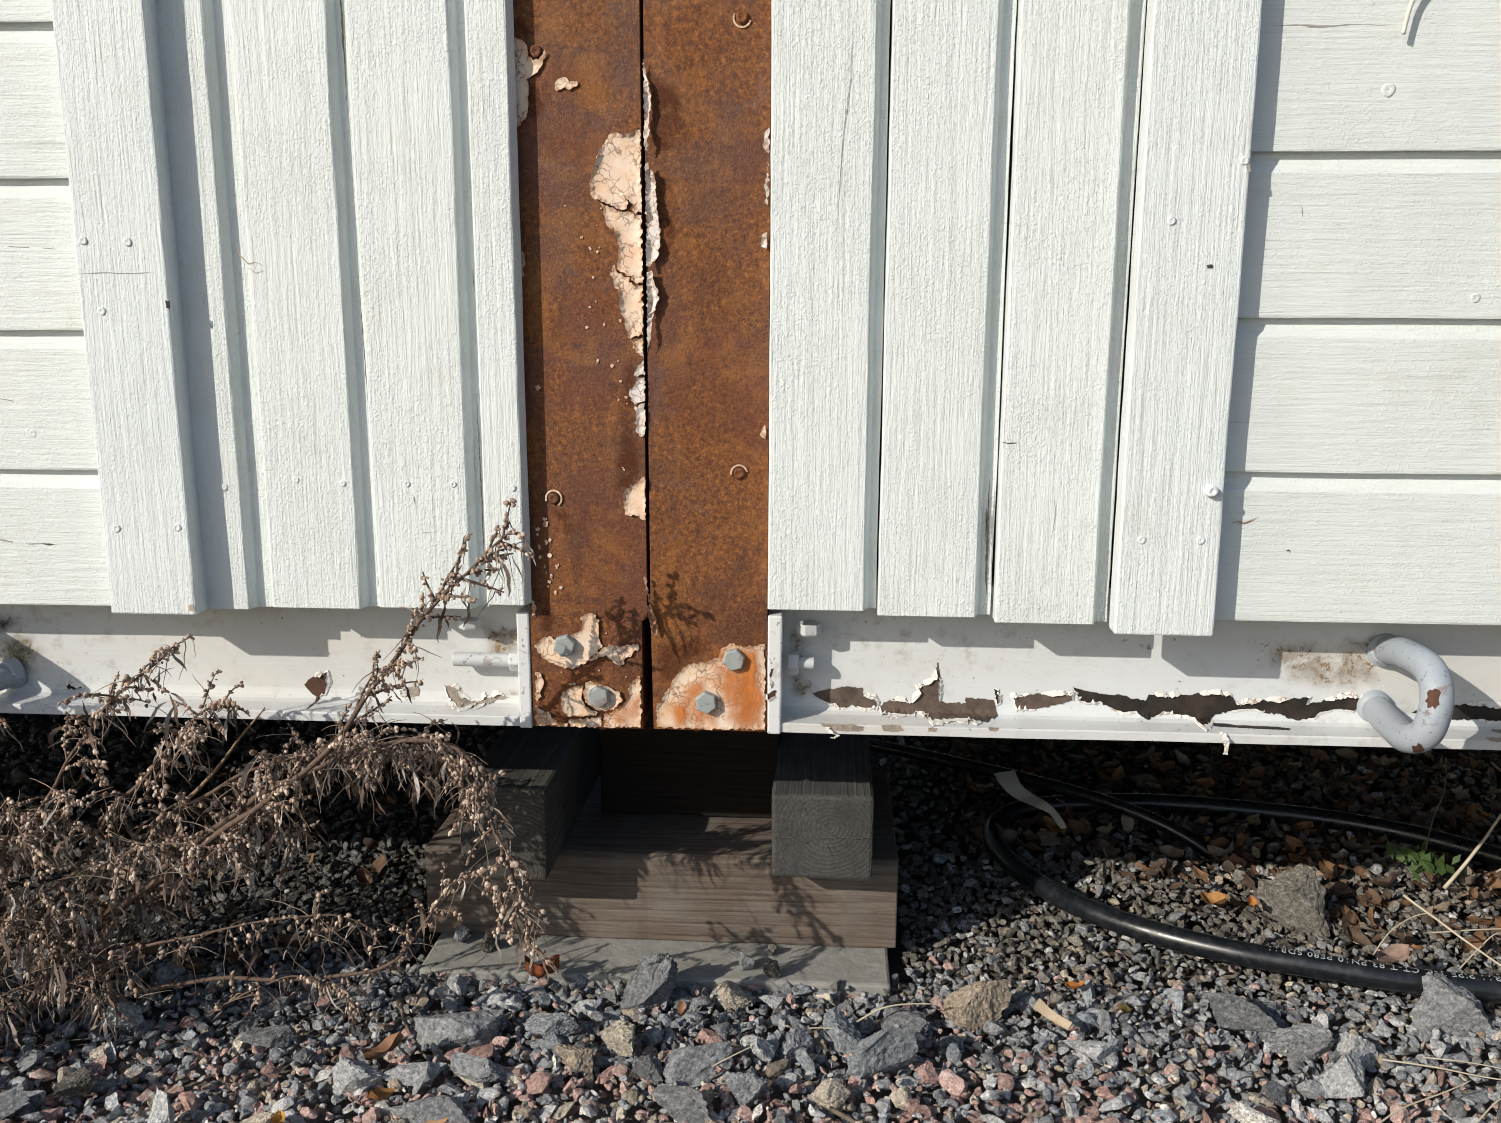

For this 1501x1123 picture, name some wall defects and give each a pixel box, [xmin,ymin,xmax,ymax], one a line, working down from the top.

peeling [514,37,546,127]
peeling [554,77,578,91]
peeling [580,60,661,437]
peeling [622,467,646,520]
peeling [643,577,658,636]
peeling [304,670,332,709]
peeling [534,613,777,731]
rust [674,650,762,724]
peeling [813,663,1363,755]
peeling [1412,689,1501,742]